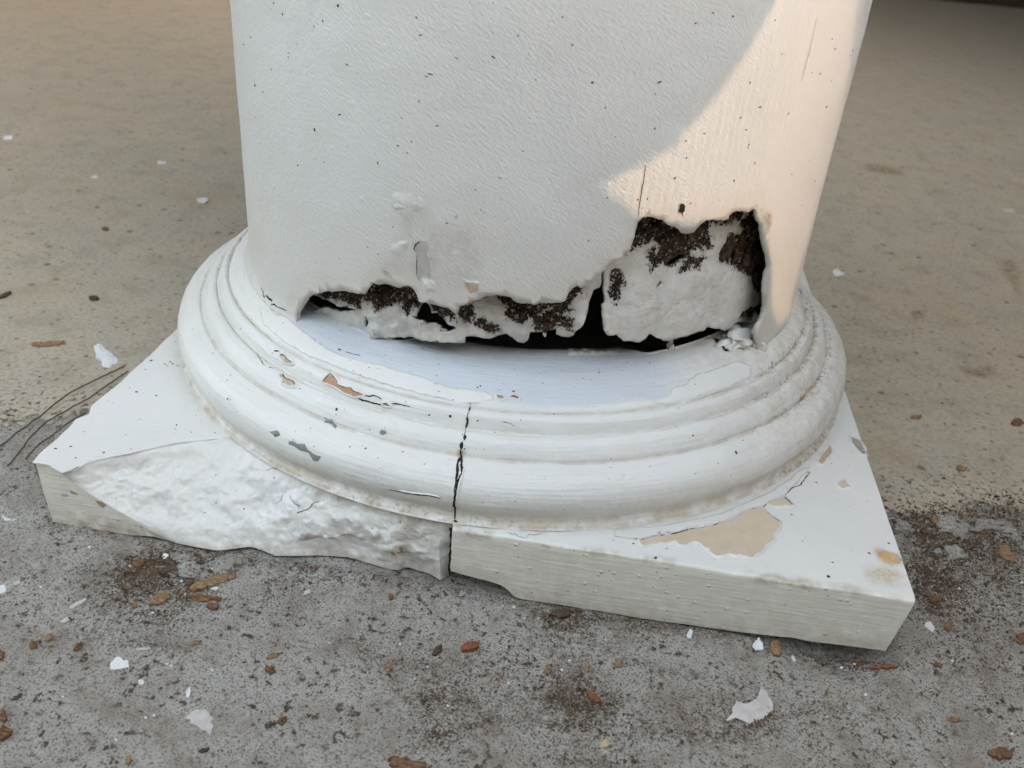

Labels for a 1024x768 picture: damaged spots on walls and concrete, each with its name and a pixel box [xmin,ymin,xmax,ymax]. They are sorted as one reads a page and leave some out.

peeling [413,240,438,295]
peeling [259,307,523,409]
spalling [62,434,452,580]
crack [389,403,471,576]
peeling [636,495,796,560]